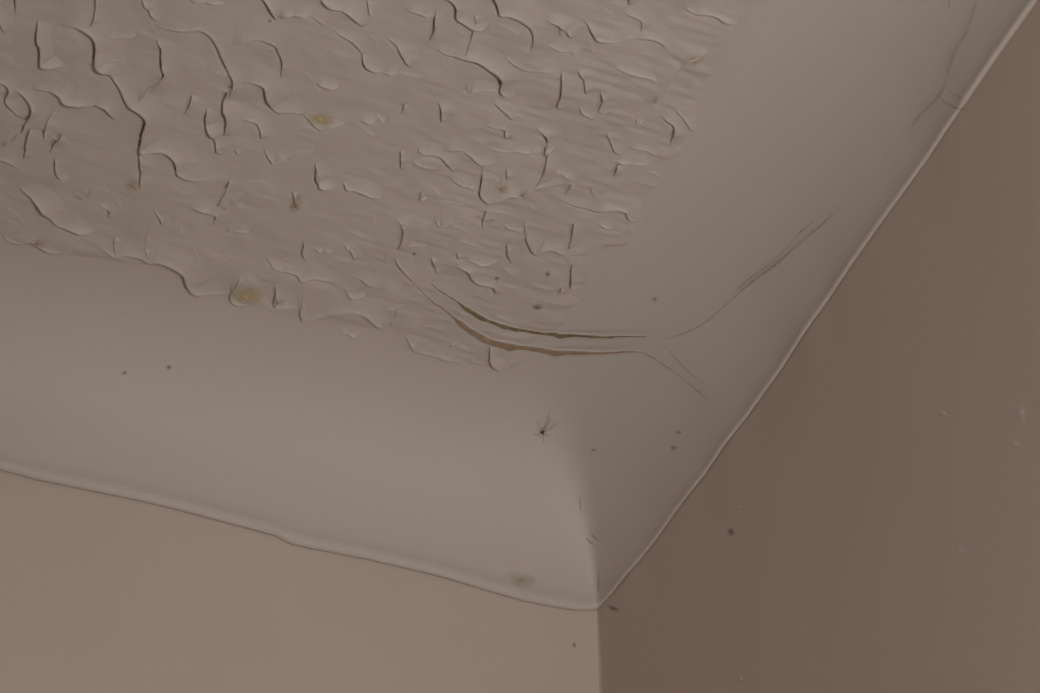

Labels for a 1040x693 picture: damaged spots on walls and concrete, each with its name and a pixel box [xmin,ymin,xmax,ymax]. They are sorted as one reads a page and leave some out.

crack [417,283,647,358]